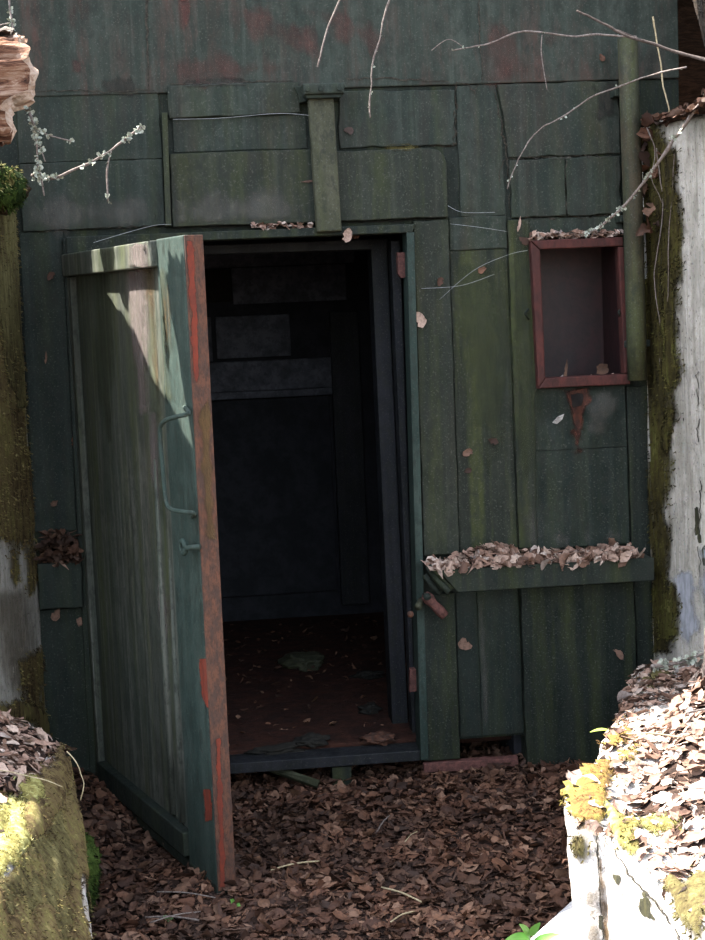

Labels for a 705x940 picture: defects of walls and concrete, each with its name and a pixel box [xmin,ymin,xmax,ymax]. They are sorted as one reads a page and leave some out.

rust [199,401,215,539]
damp [587,859,620,940]